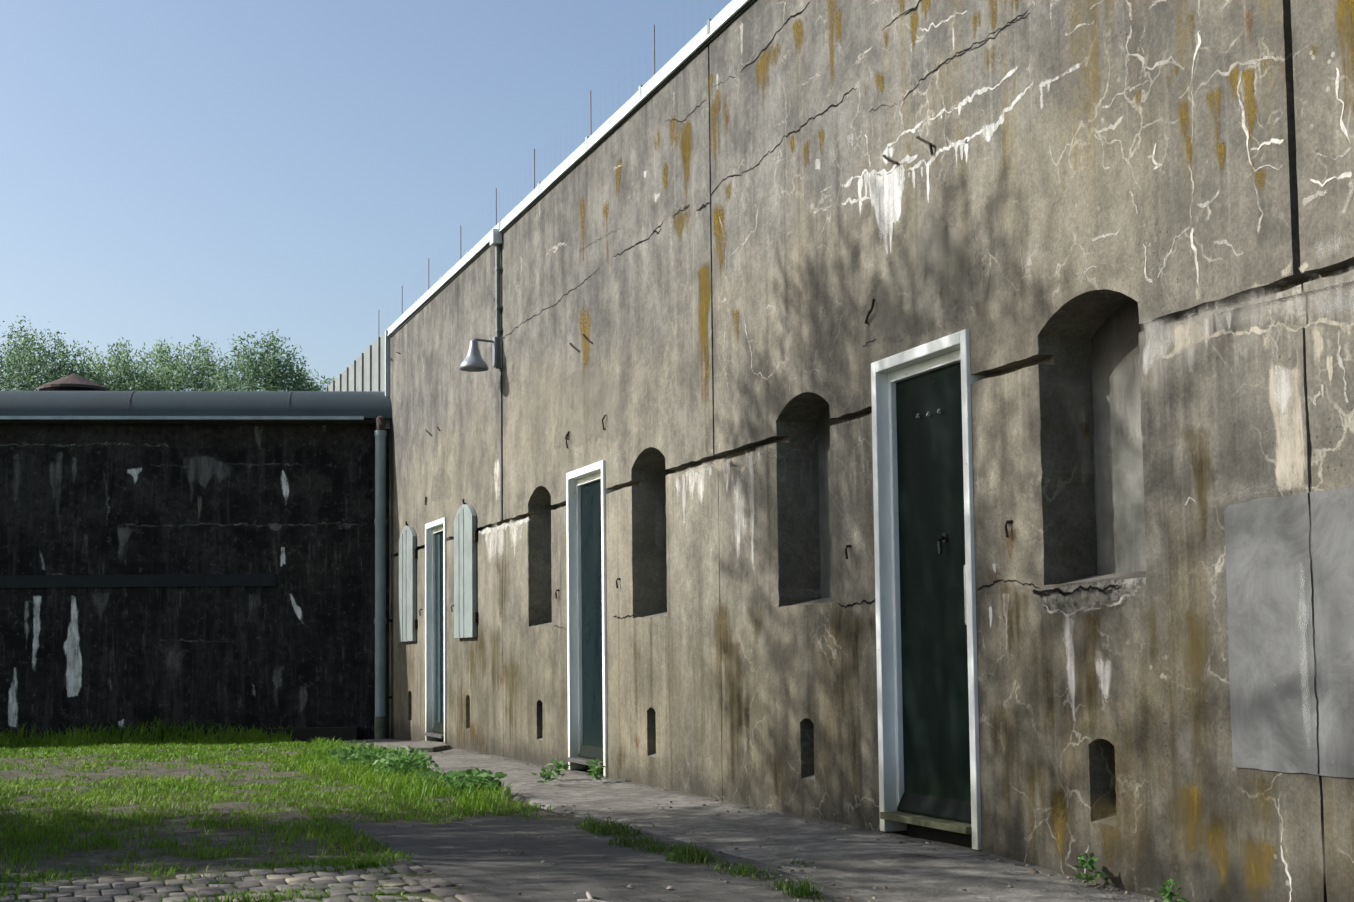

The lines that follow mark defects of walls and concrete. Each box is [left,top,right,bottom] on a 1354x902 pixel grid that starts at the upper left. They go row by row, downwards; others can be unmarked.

crack [501,0,1031,340]
water stain [842,64,1079,254]
crack [1303,336,1311,490]
peeling [25,596,41,664]
peeling [64,597,82,697]
spalling [1033,577,1146,616]
peeling [8,668,18,727]